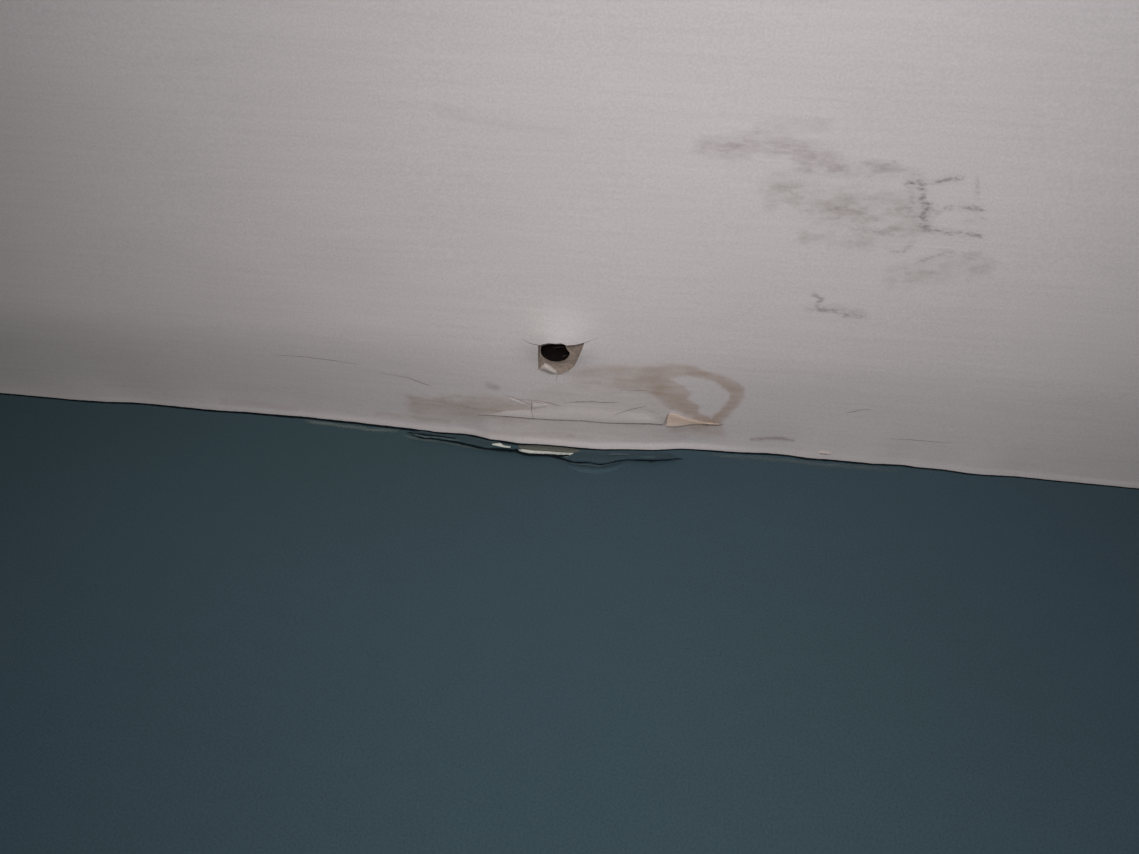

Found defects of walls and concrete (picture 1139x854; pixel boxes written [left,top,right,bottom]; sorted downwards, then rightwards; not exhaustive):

hole [541,344,570,362]
peeling [407,431,683,466]